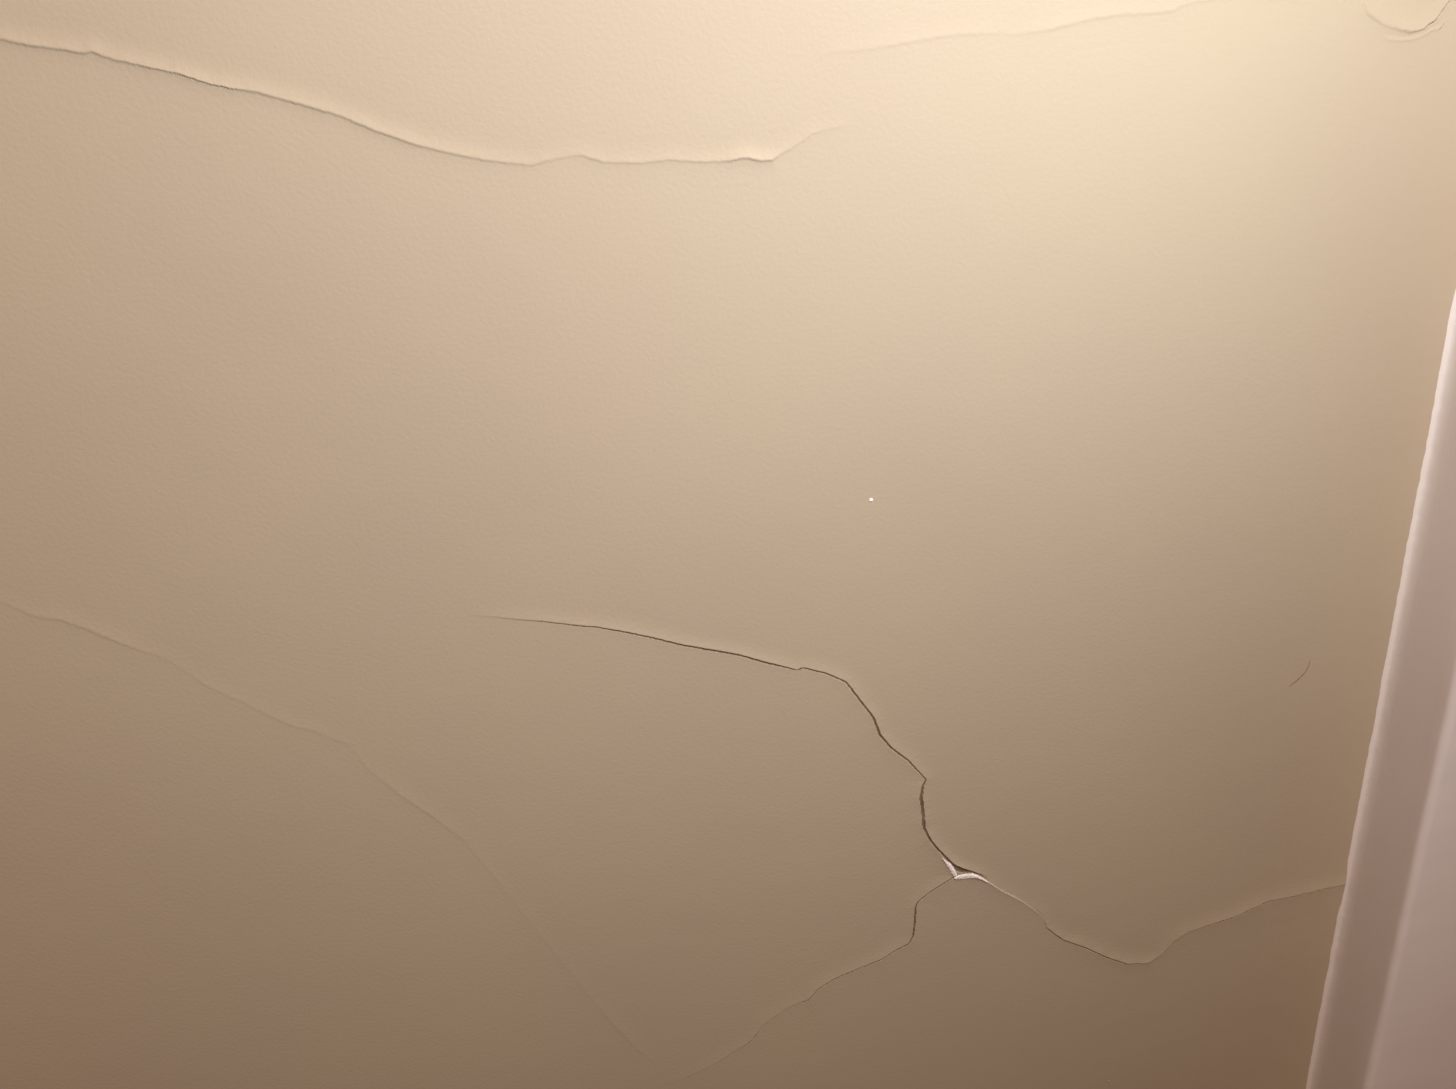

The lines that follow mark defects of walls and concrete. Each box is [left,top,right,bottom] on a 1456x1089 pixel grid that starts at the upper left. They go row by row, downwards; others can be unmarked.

crack [468,602,1348,1089]